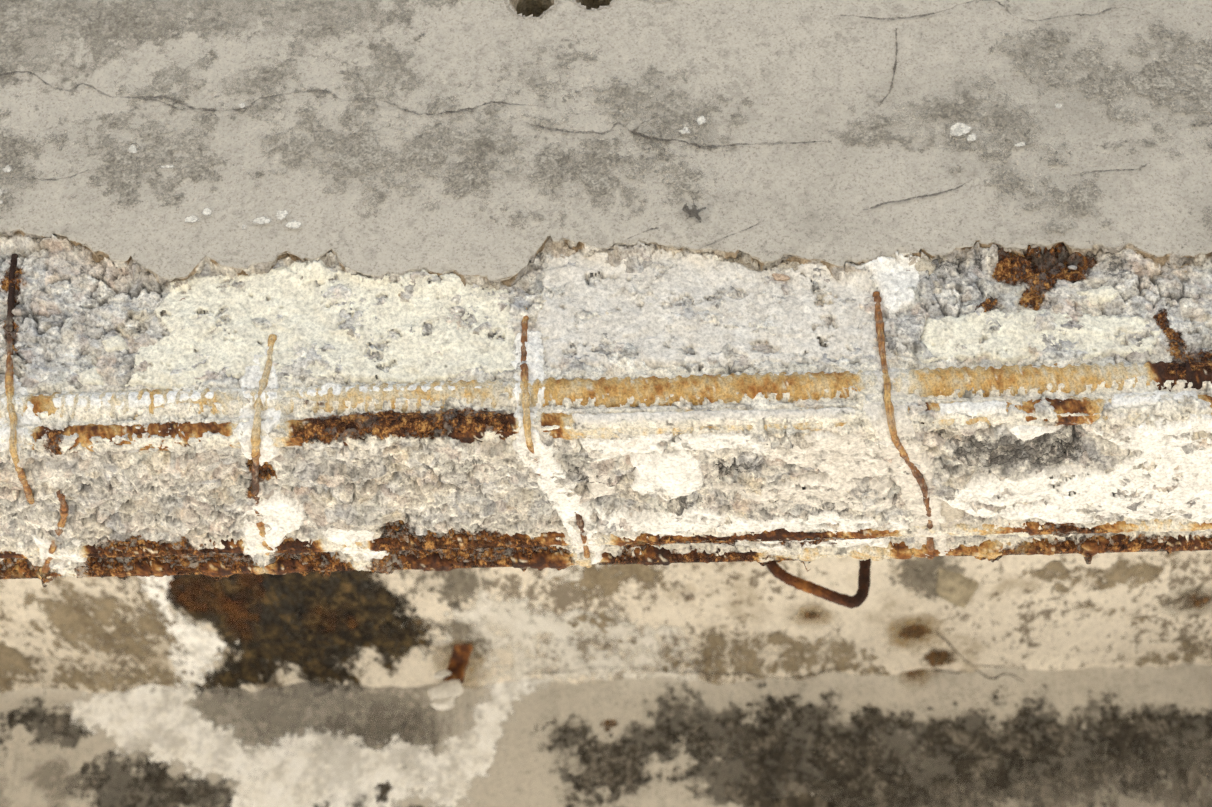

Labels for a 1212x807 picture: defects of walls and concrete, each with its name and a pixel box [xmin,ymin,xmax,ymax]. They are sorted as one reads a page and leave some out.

crack [0,71,322,111]
crack [864,13,935,103]
crack [871,185,963,208]
corrosion [992,243,1098,311]
corrosion [1153,309,1212,379]
corrosion [43,429,64,456]
corrosion [290,400,514,445]
spalling [0,229,1212,580]
leakage [0,249,1212,807]
corrosion [598,537,886,571]
corrosion [961,522,1212,564]
corrosion [0,517,575,700]